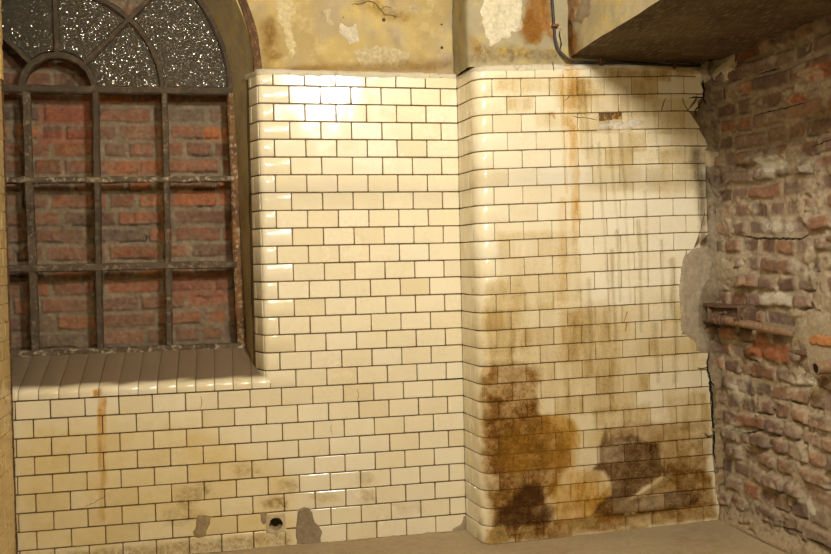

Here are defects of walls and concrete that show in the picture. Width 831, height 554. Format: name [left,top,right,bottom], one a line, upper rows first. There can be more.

peeling [323,8,411,70]
peeling [480,0,524,46]
crack [661,80,706,115]
spalling [597,113,645,131]
flaking render [809,334,831,347]